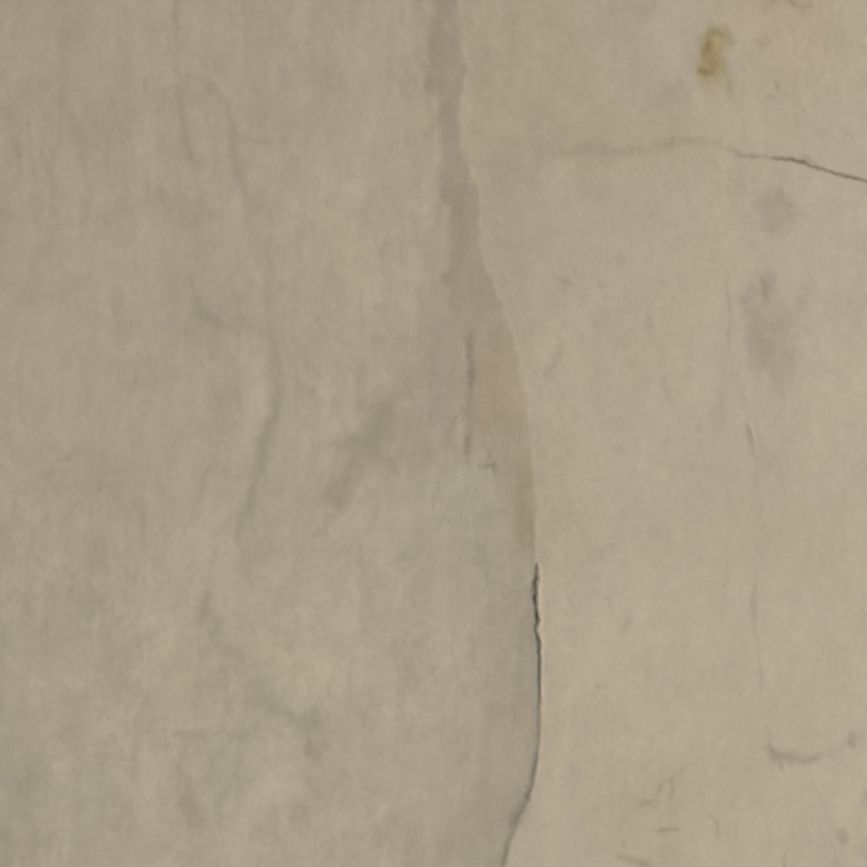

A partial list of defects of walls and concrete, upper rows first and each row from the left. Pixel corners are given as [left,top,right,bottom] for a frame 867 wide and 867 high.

rust [691,17,748,110]
crack [535,130,867,185]
crack [495,561,551,867]